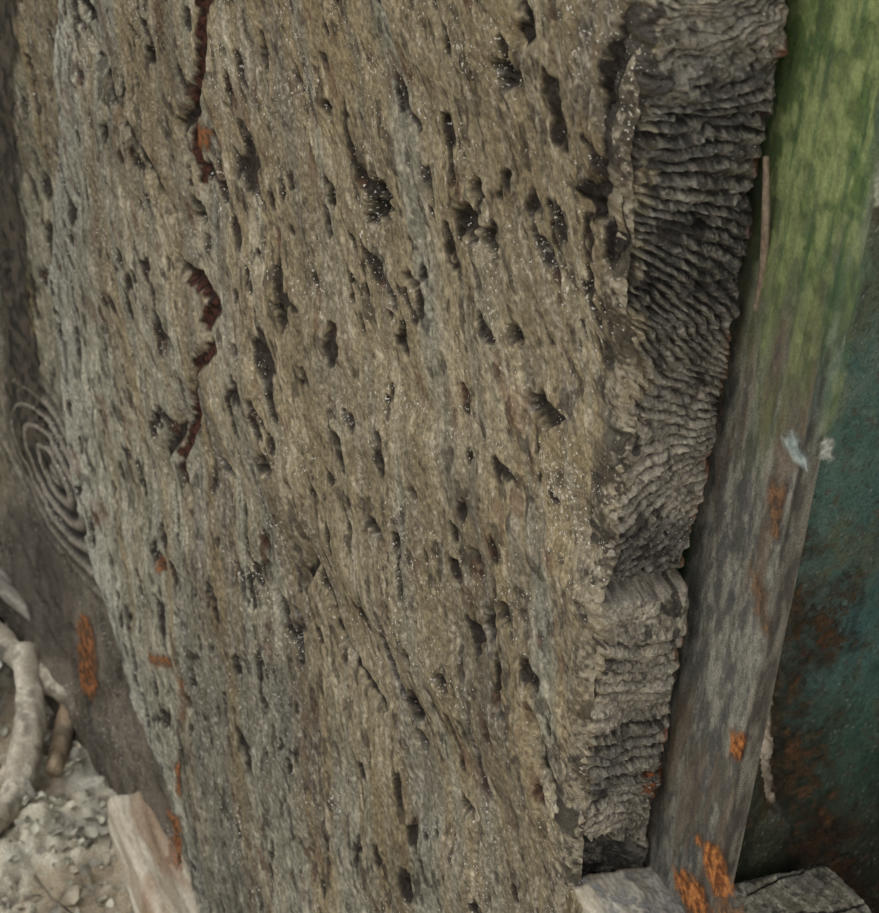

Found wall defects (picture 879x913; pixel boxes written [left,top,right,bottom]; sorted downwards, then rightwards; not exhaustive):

corrosion [77,613,98,700]
corrosion [674,835,734,913]
crack [749,852,849,895]
crack [799,897,878,913]